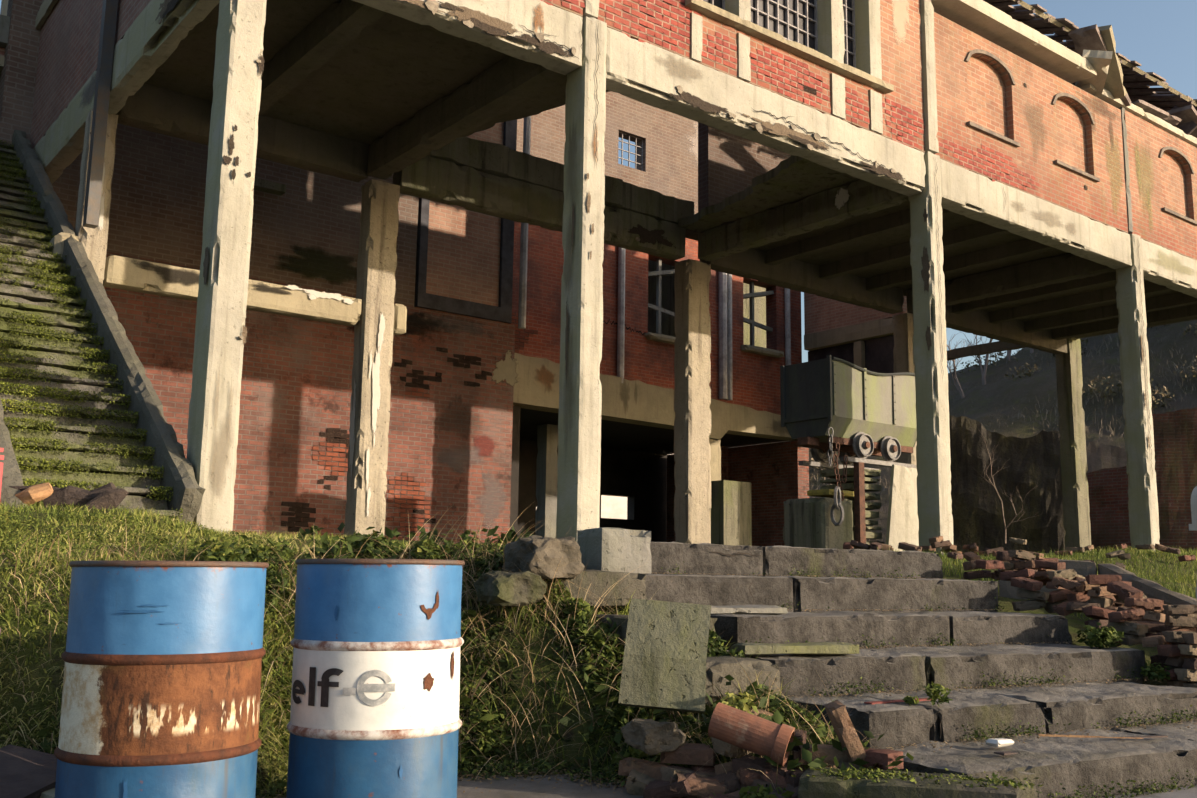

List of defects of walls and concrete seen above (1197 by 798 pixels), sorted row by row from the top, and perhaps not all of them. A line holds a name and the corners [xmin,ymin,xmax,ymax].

spalling [400,0,576,57]
spalling [541,0,829,107]
spalling [670,85,829,151]
spalling [845,86,925,149]
spalling [223,125,251,180]
spalling [855,160,906,183]
spalling [938,139,1040,191]
spalling [312,312,538,517]
spalling [387,472,436,536]